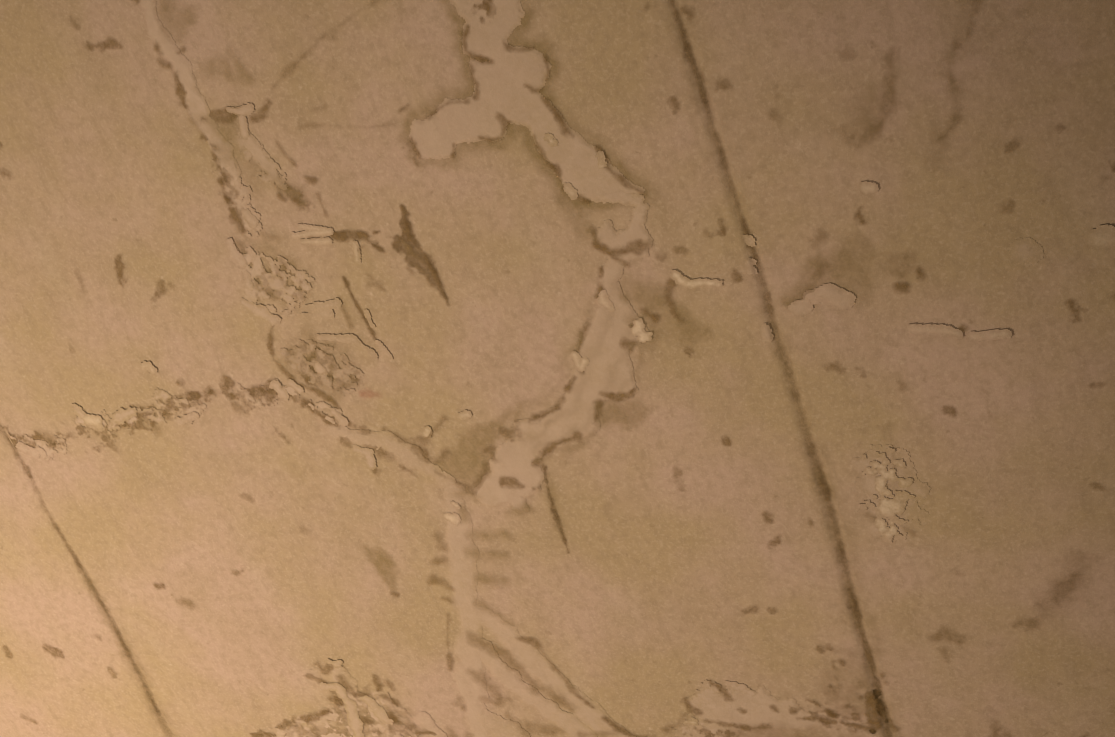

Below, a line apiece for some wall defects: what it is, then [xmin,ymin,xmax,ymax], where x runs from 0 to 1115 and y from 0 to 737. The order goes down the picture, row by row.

damp [138,0,378,361]
crack [343,277,393,360]
damp [667,270,723,312]
damp [409,0,658,737]
crack [7,336,456,491]
damp [252,659,447,737]
damp [670,680,835,737]